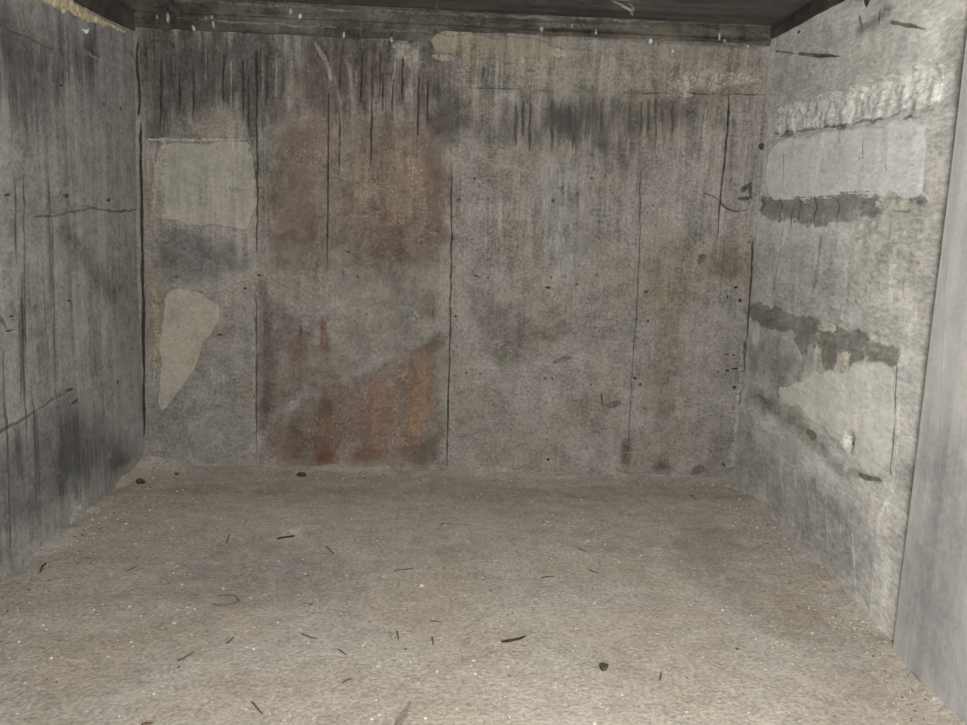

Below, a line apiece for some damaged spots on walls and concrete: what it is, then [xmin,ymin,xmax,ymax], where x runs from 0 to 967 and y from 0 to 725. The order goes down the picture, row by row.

water stain [14,179,25,289]
water stain [0,0,95,139]
peeling [148,137,257,230]
water stain [144,0,760,166]
peeling [738,63,945,227]
water stain [3,305,37,480]
peeling [151,277,222,411]
spalling [717,341,747,470]
peeling [727,286,900,481]